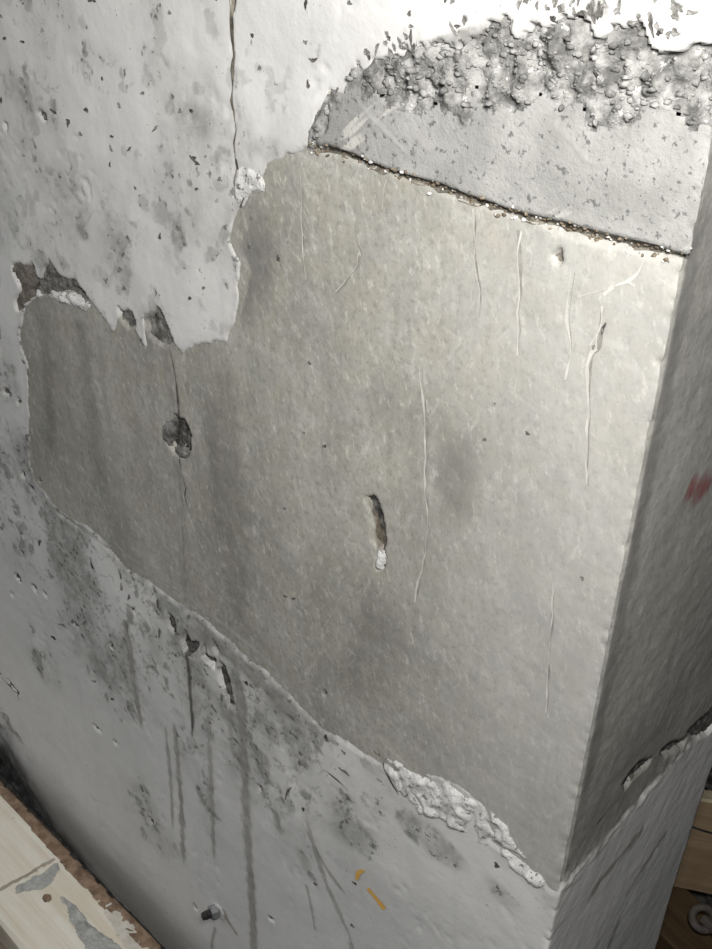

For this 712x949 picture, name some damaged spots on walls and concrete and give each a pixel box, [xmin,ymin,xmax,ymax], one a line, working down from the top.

crack [229,0,244,208]
crack [299,176,307,279]
spalling [363,10,423,69]
crack [308,140,692,484]
spalling [322,81,712,254]
spalling [449,0,700,45]
spalling [12,147,682,891]
crack [413,367,431,602]
leakage [185,650,194,734]
leakage [166,727,185,854]
leakage [226,681,256,949]
leakage [307,824,346,928]